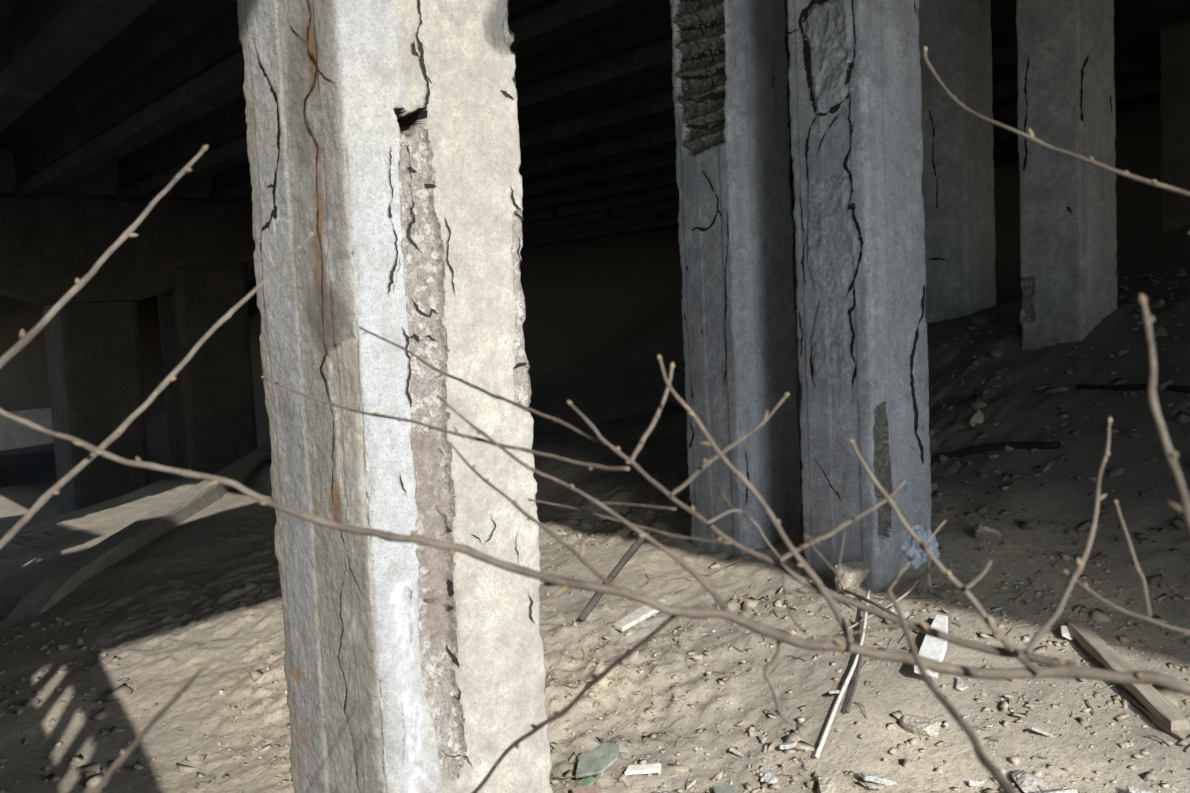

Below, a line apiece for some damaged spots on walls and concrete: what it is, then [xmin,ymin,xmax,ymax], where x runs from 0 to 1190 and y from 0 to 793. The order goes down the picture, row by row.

spalling [673,0,727,155]
crack [1022,59,1030,170]
crack [388,0,455,407]
crack [787,0,864,388]
crack [256,0,362,792]
spalling [398,123,467,780]
crack [435,505,519,562]
crack [743,450,751,506]
crack [815,459,842,502]
crack [910,257,946,465]
crack [407,578,454,656]
crack [446,644,461,700]